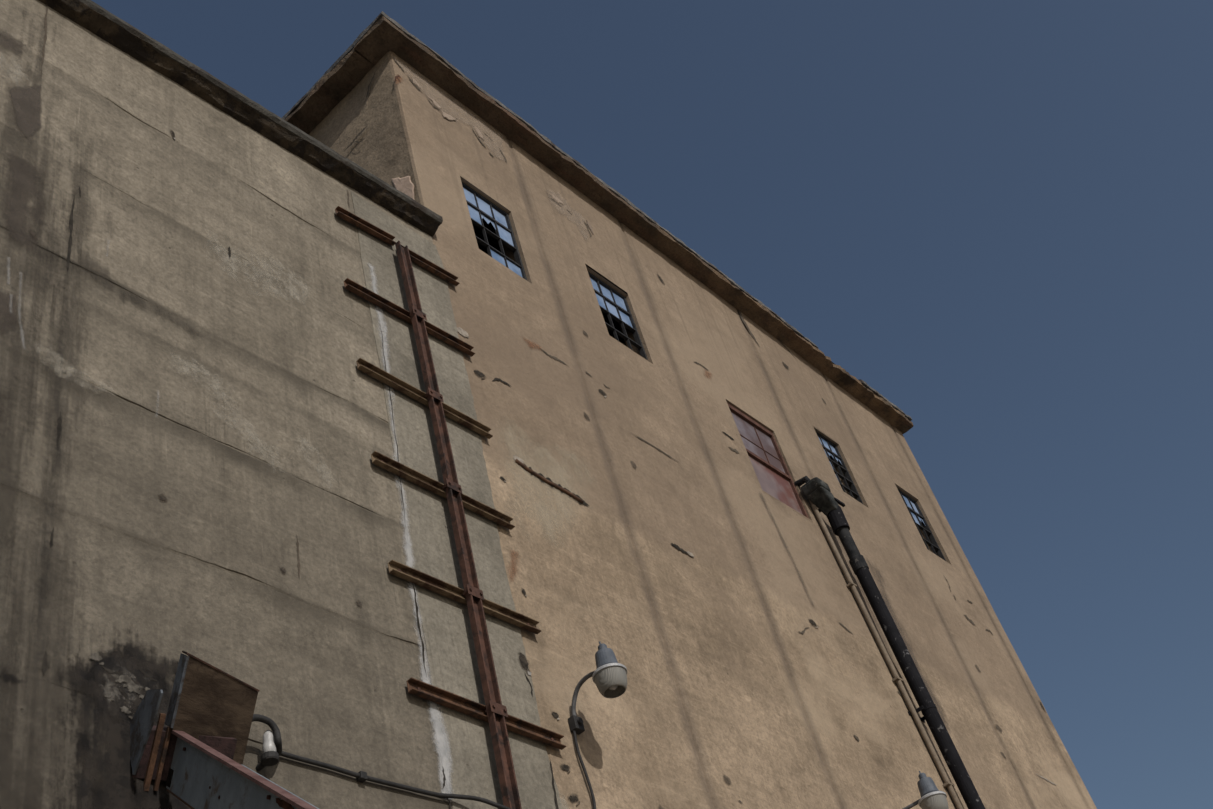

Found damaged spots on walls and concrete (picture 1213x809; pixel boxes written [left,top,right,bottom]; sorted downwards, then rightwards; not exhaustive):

peeling [391,176,415,200]
leakage [109,644,179,727]
leakage [59,663,191,809]
corrosion [276,798,294,809]